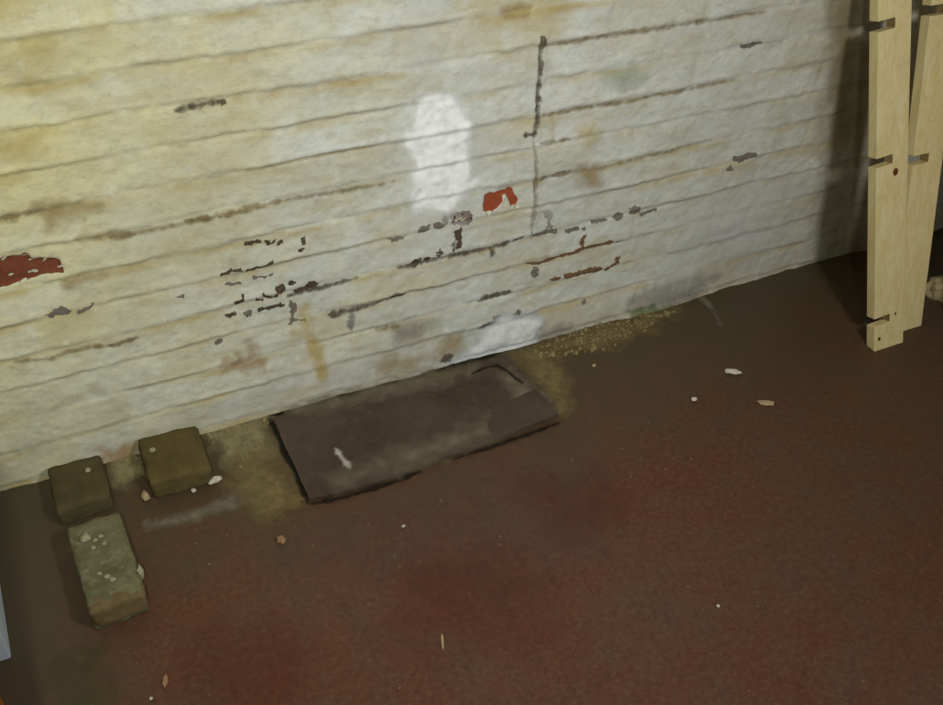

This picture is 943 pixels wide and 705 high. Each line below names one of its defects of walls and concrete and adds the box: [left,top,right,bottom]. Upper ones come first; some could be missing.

leakage [402,92,480,215]
peeling [410,187,519,267]
spalling [533,205,657,237]
peeling [0,253,65,287]
spalling [220,260,318,325]
spalling [550,256,621,281]